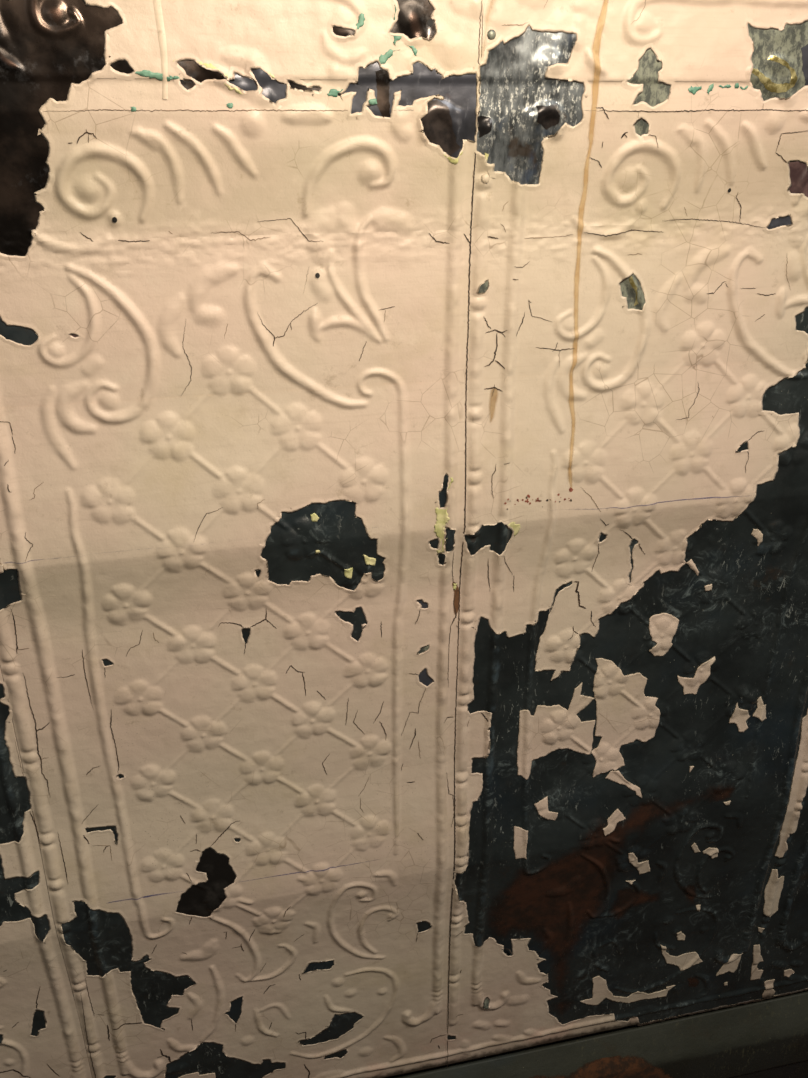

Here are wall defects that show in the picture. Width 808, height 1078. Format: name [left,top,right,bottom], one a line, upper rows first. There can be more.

peeling [0,0,139,262]
peeling [170,0,591,191]
peeling [743,14,808,107]
peeling [0,310,44,350]
peeling [0,559,26,614]
peeling [251,495,390,644]
peeling [424,517,516,568]
peeling [451,354,808,1027]
peeling [0,680,199,1032]
peeling [172,835,244,920]
corrosion [492,803,680,979]
corrosion [533,1056,670,1078]